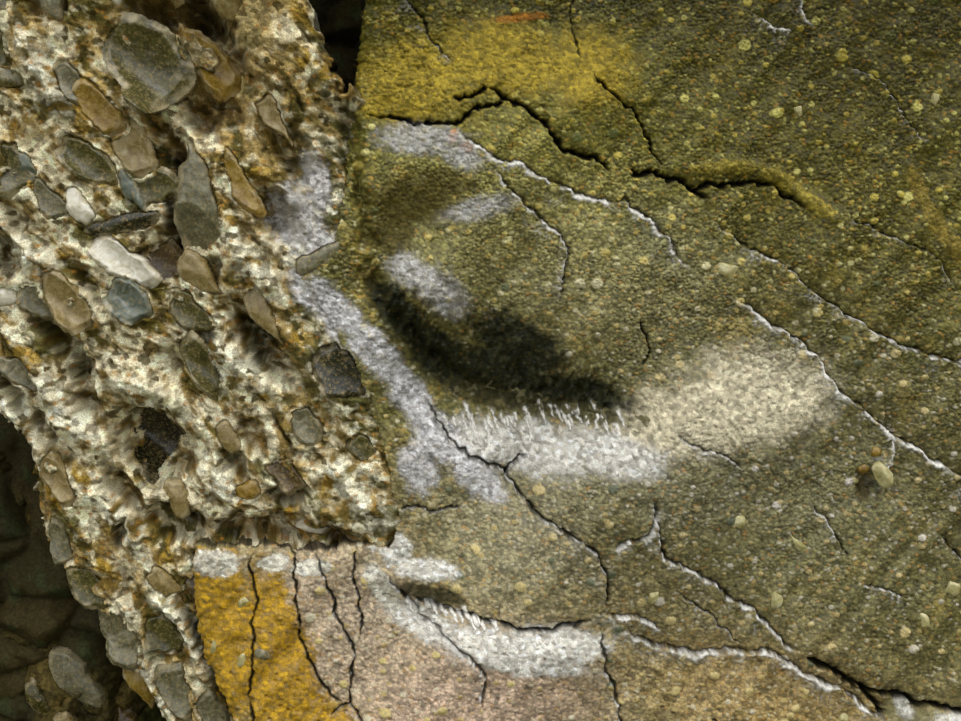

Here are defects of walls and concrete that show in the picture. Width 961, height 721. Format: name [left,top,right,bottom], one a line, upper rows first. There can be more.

crack [569,0,580,55]
damp [386,125,480,167]
damp [450,200,502,220]
crack [380,87,681,289]
crack [596,79,802,207]
damp [393,255,467,310]
damp [289,273,830,502]
crack [291,548,363,721]
crack [404,504,457,513]
damp [363,532,610,677]
crack [394,584,584,701]
crack [431,408,961,721]